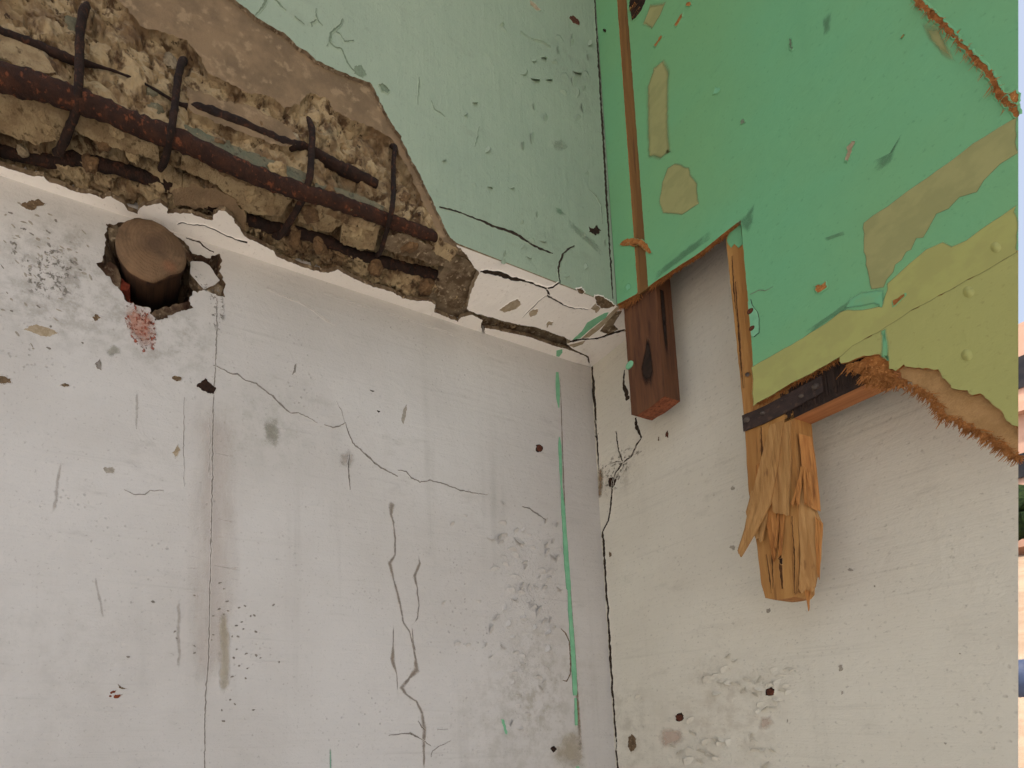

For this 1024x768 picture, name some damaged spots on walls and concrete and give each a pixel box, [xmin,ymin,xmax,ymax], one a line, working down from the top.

rust [125,301,156,352]
spalling [0,0,476,320]
crack [439,206,589,318]
crack [570,328,625,343]
crack [124,298,488,768]
crack [591,366,643,768]